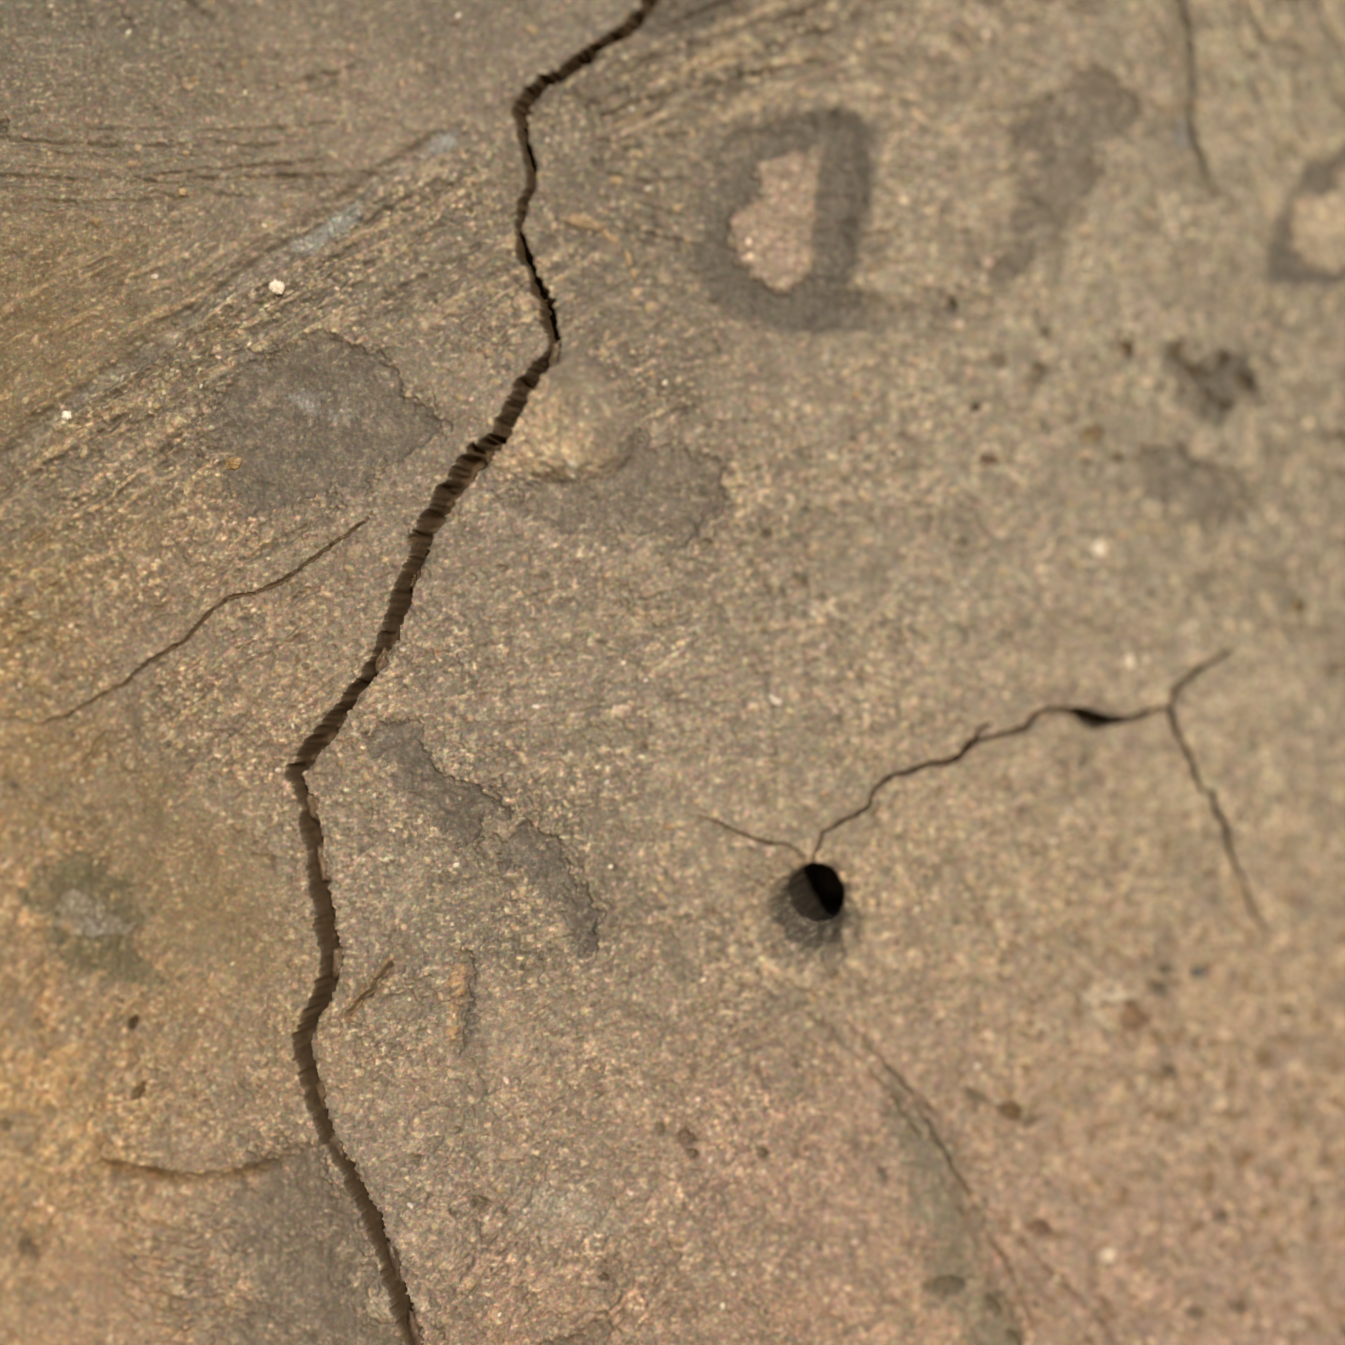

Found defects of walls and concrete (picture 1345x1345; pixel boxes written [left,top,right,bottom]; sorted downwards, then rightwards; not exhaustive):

crack [27,510,373,728]
crack [284,0,659,1345]
crack [696,647,1268,934]